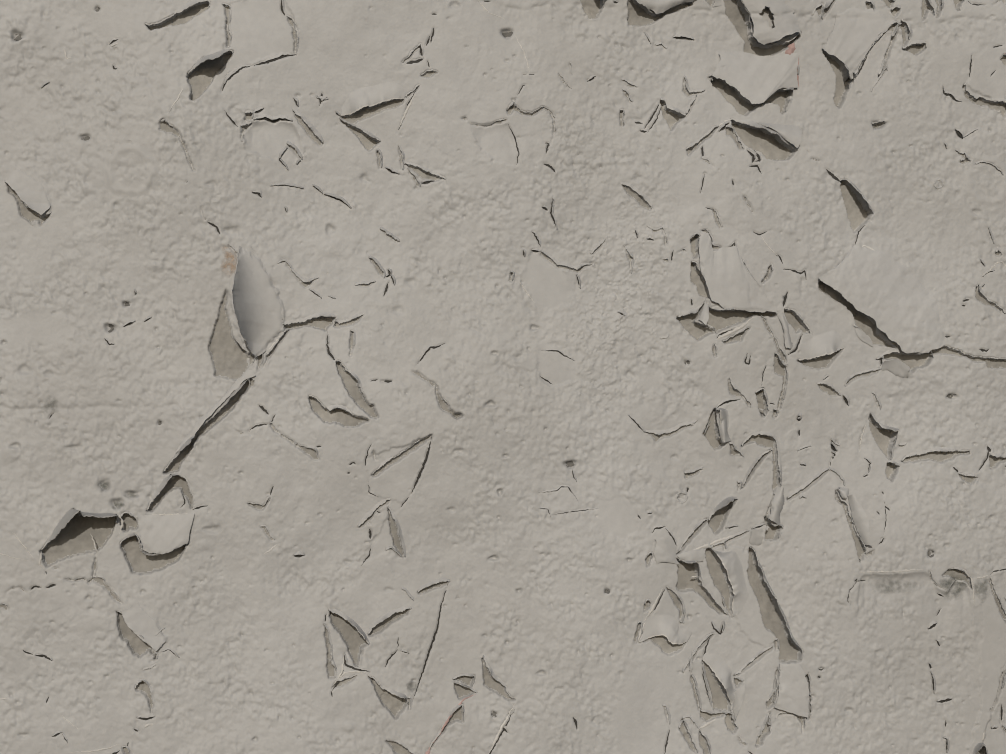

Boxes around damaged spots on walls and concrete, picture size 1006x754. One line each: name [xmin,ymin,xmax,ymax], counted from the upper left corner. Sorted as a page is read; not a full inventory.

peeling [4,169,51,226]
peeling [145,0,210,26]
peeling [225,97,323,142]
peeling [336,28,446,187]
peeling [636,0,802,133]
peeling [686,118,874,214]
peeling [812,0,927,80]
peeling [817,225,1006,405]
peeling [38,243,392,568]
crack [240,405,321,459]
peeling [628,229,886,754]
peeling [324,578,450,710]